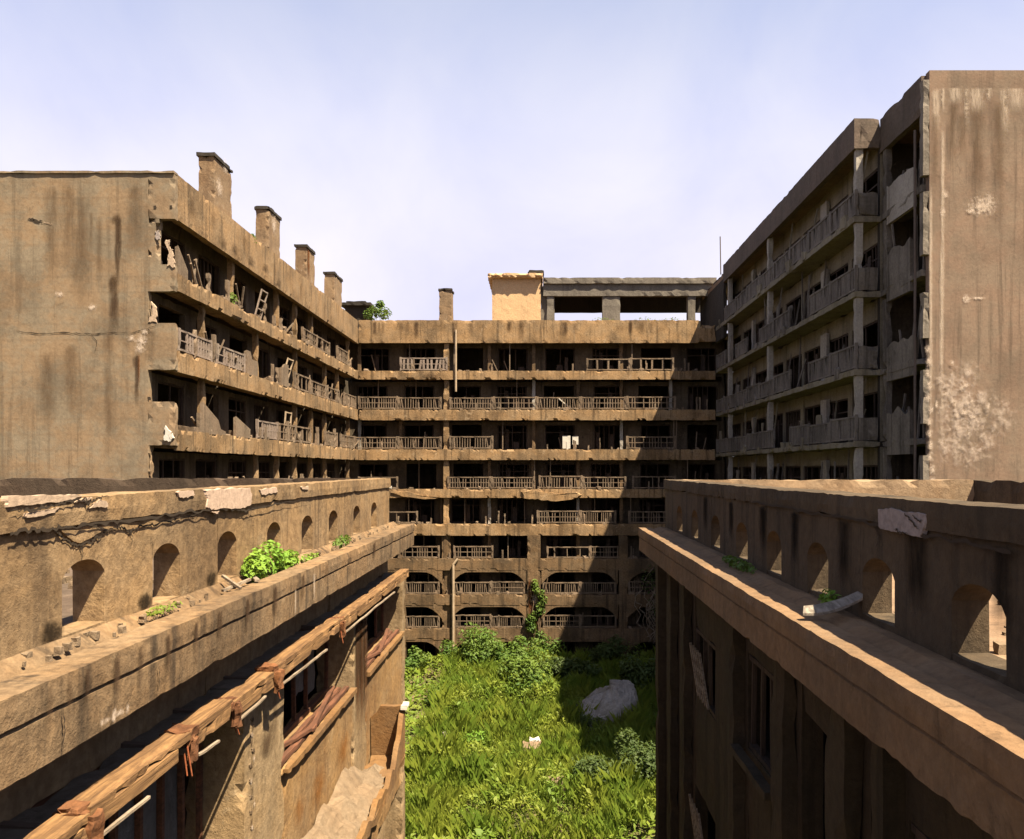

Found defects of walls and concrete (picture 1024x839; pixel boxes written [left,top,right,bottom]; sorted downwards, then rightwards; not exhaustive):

leakage [110,216,121,317]
crack [20,325,156,350]
peeling [926,348,1001,480]
crack [10,496,305,557]
peeling [175,487,278,514]